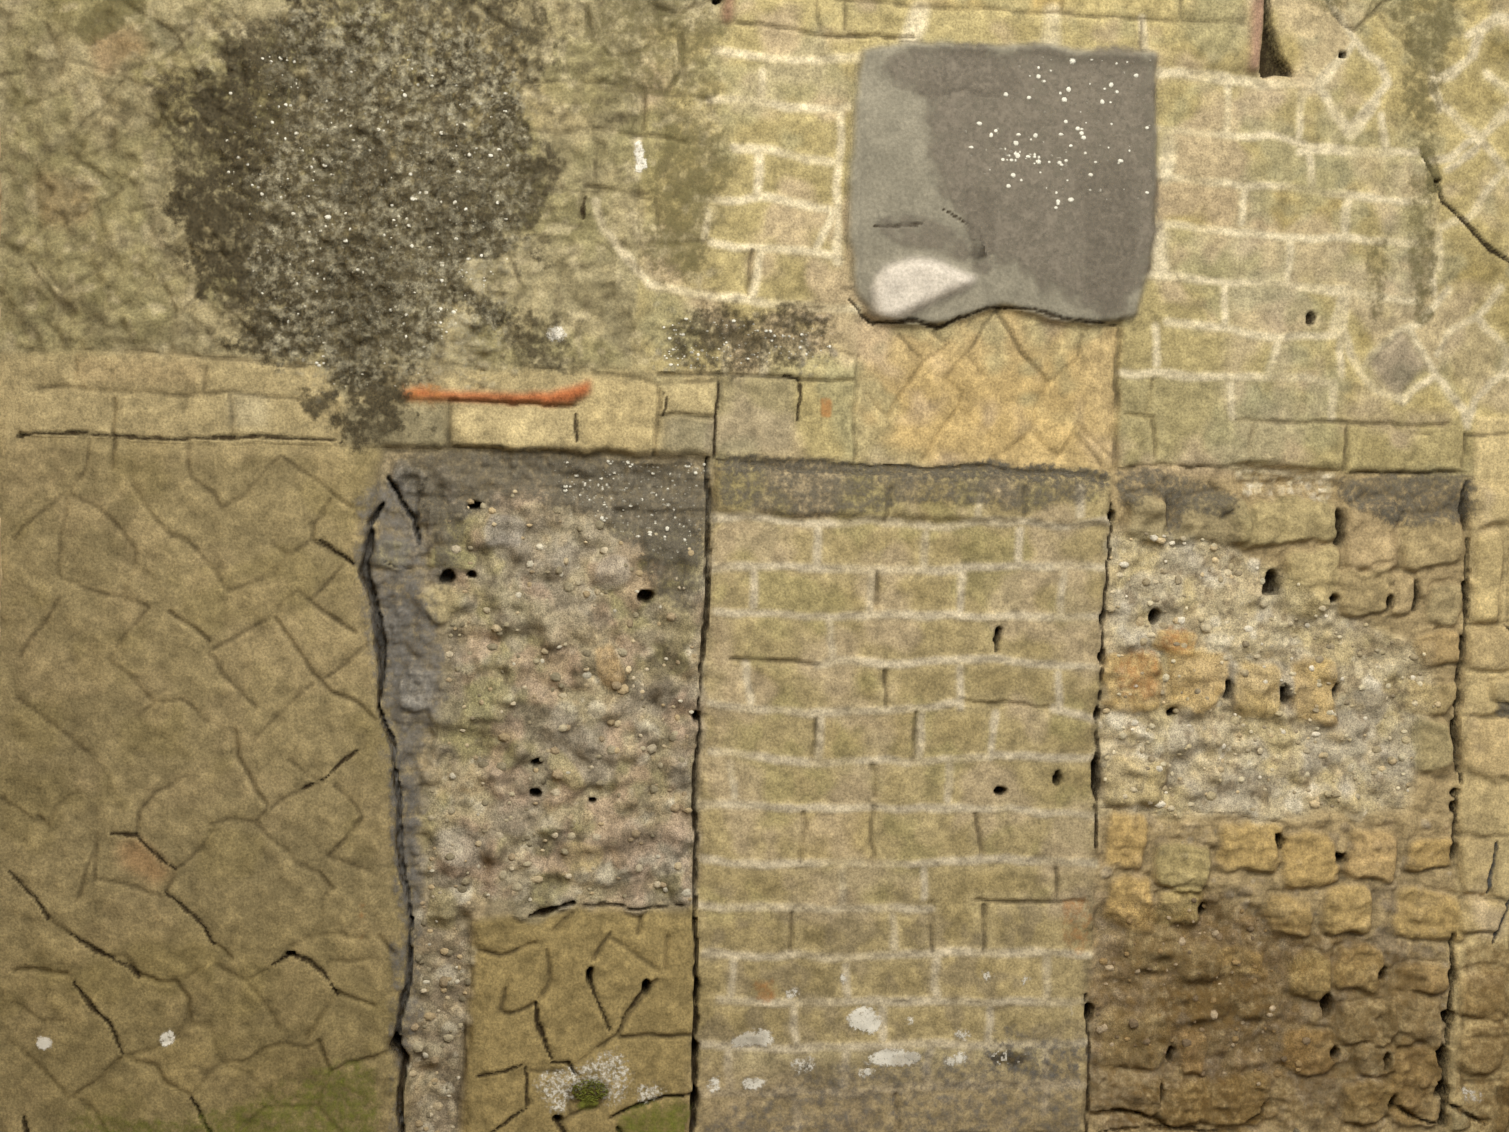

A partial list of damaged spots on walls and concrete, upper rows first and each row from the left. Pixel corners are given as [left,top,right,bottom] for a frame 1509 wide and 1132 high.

leakage [147,0,733,449]
leakage [663,303,831,380]
leakage [883,46,1158,315]
crack [303,476,427,1132]
spalling [399,488,705,1132]
crack [529,383,719,1132]
leakage [357,446,1235,1047]
crack [1091,502,1112,848]
spalling [1093,897,1319,1089]
spalling [1101,528,1441,827]
crack [1389,933,1485,1126]
crack [1449,485,1469,855]